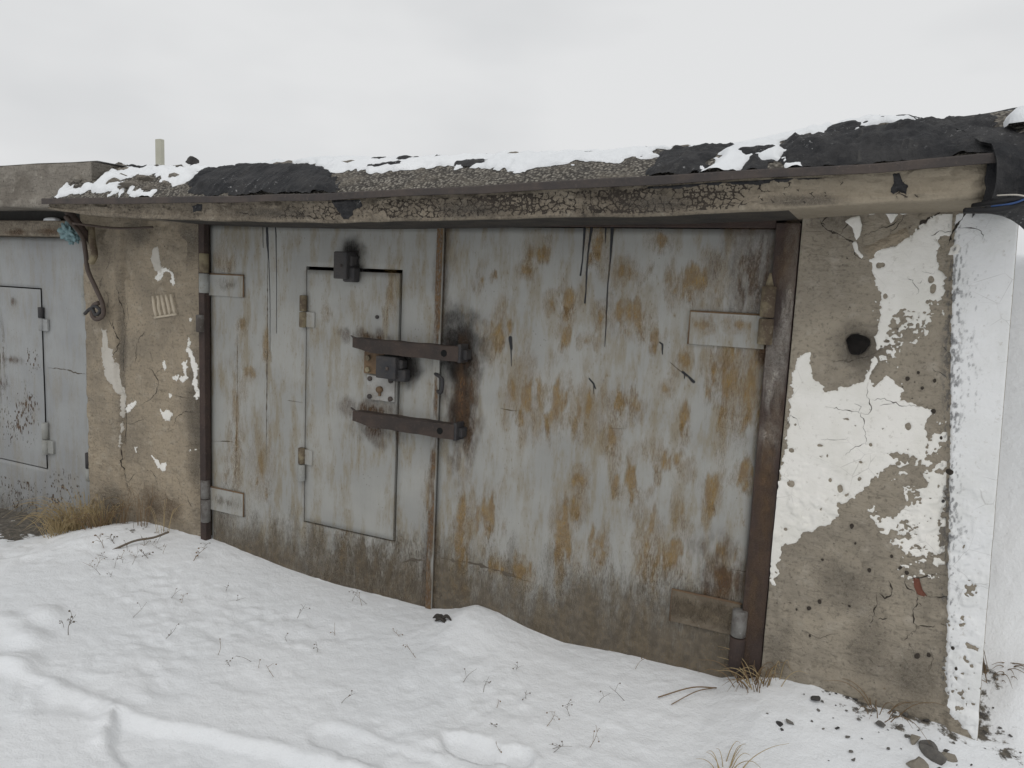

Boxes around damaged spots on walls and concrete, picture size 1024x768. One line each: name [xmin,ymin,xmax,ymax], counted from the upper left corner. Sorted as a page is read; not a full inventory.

crack [237,181,983,259]
peeling [150,246,175,286]
rust [434,228,445,343]
peeling [101,329,137,453]
crack [99,264,198,505]
peeling [160,393,173,421]
peeling [162,337,200,400]
rust [507,378,593,428]
peeling [769,214,961,597]
rust [612,457,636,501]
rust [456,493,495,568]
crack [871,574,947,683]